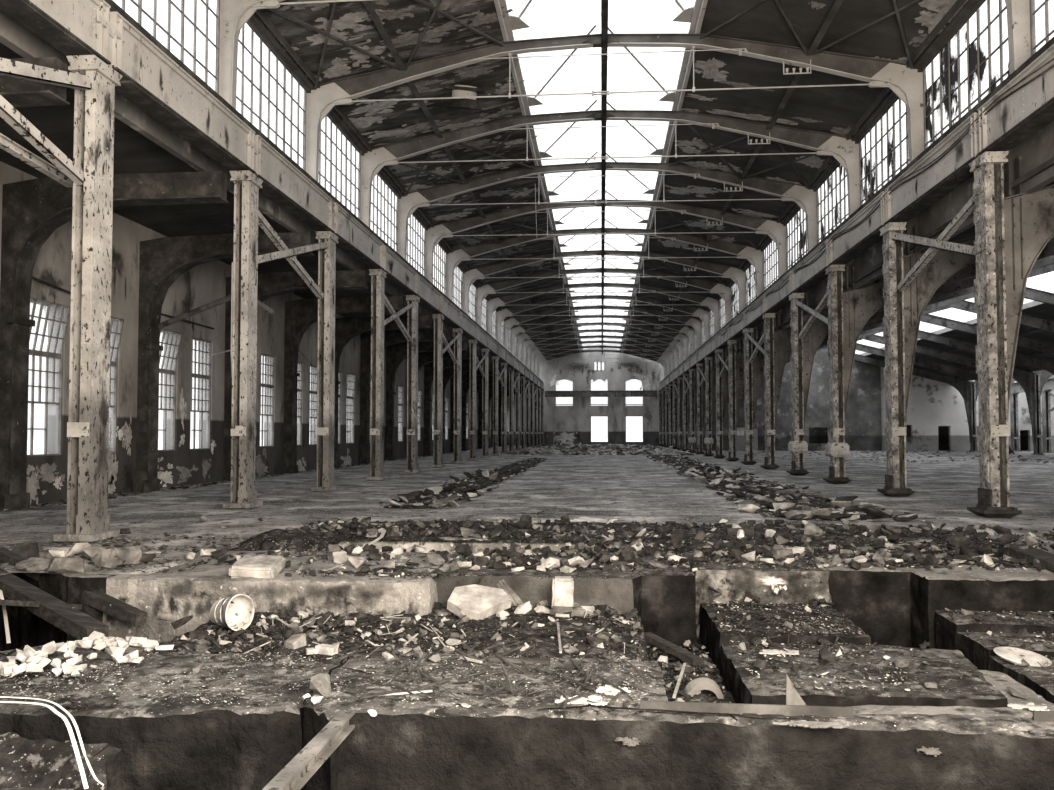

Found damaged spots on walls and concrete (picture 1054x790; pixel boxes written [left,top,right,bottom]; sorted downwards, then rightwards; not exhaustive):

peeling [278,0,513,81]
peeling [870,0,968,63]
peeling [694,57,774,91]
peeling [342,59,525,140]
peeling [681,94,859,136]
peeling [674,137,742,173]
peeling [664,185,724,198]
peeling [26,463,65,505]
peeling [158,439,216,487]